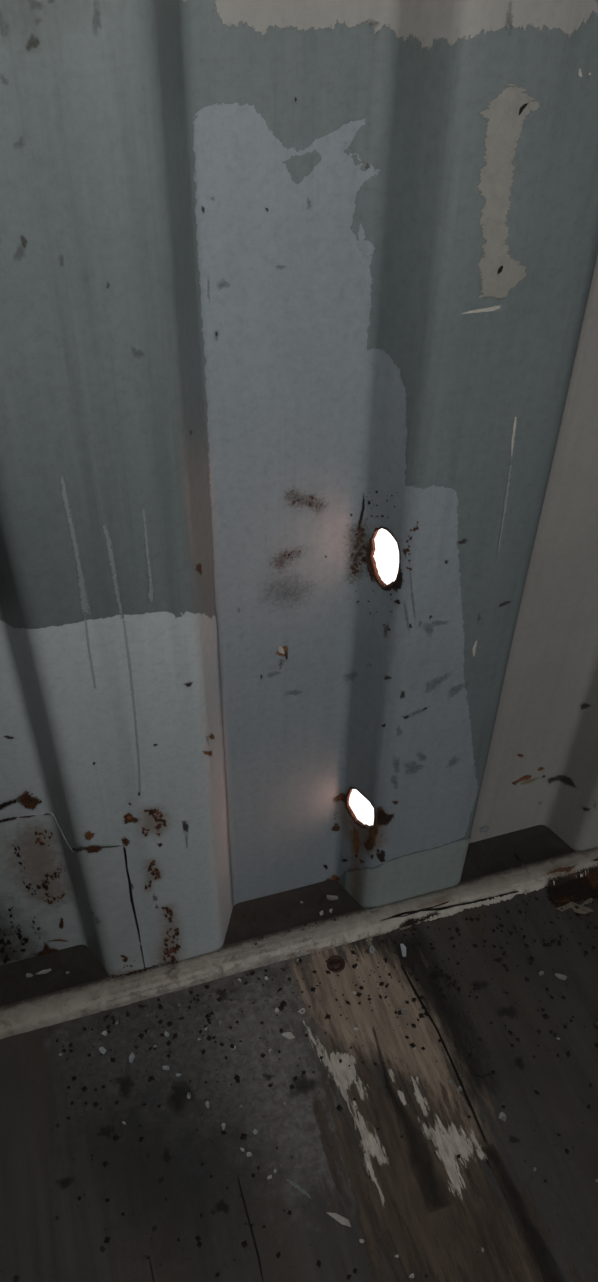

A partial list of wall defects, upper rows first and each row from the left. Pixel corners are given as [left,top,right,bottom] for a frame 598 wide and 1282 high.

peeling [473,84,540,299]
rust [350,491,419,631]
rust [0,791,53,846]
rust [0,906,66,965]
rust [12,845,66,904]
crack [72,831,146,971]
rust [109,803,181,978]
rust [324,793,394,881]